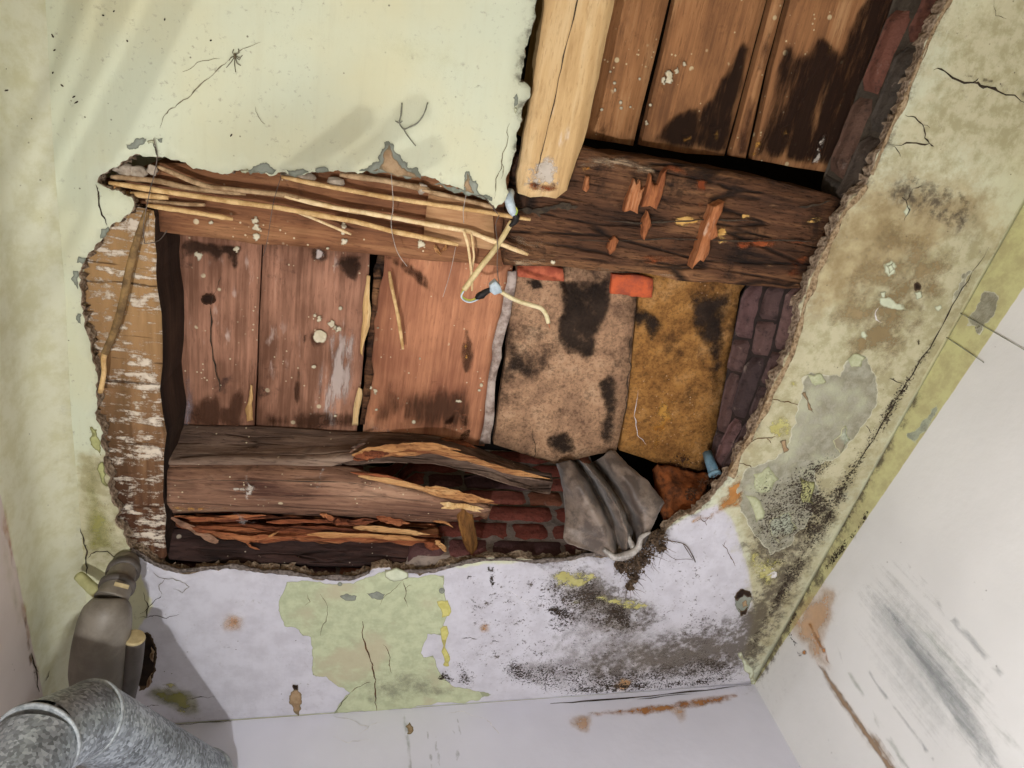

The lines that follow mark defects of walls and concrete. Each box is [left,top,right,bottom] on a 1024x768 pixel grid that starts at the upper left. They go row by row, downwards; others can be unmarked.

peeling [359,141,421,179]
peeling [435,171,492,201]
damp [657,45,752,154]
damp [758,0,893,164]
crack [890,116,934,157]
crack [934,68,1023,102]
flaking render [727,0,953,578]
damp [470,341,932,695]
crack [335,621,391,743]
peeling [130,547,604,716]
rust [617,695,734,714]
rust [788,597,894,768]